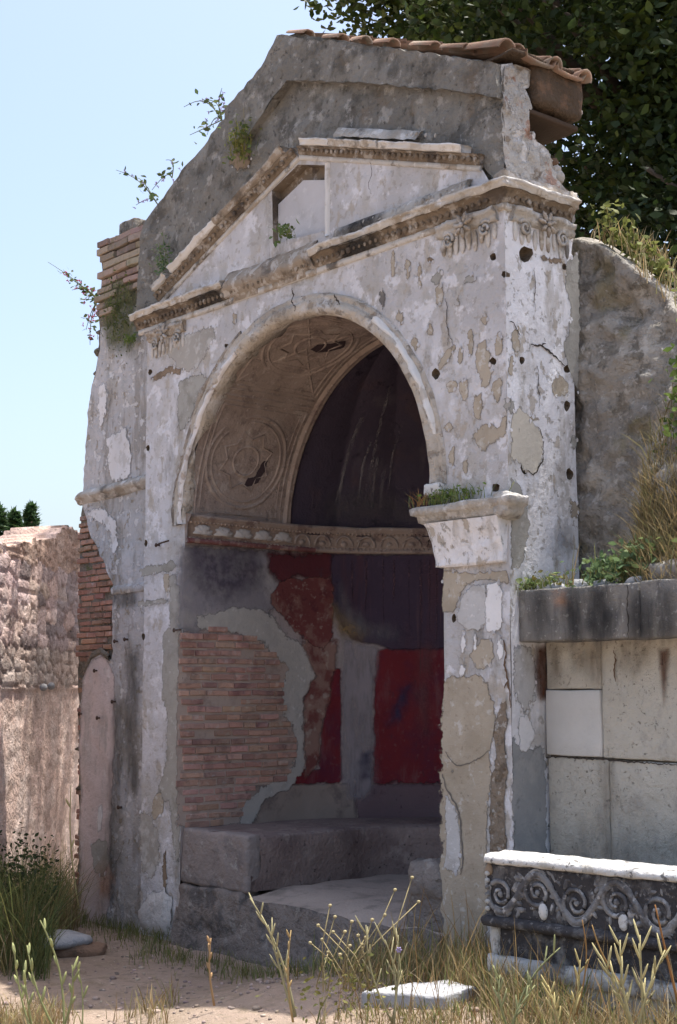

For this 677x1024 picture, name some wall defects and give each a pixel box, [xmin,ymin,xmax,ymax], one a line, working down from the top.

spalling [501,63,566,190]
flaking render [106,427,132,482]
flaking render [438,313,544,474]
crack [510,272,565,476]
flaking render [541,251,581,397]
damp [114,655,136,787]
flaking render [138,546,338,891]
flaking render [439,479,549,956]